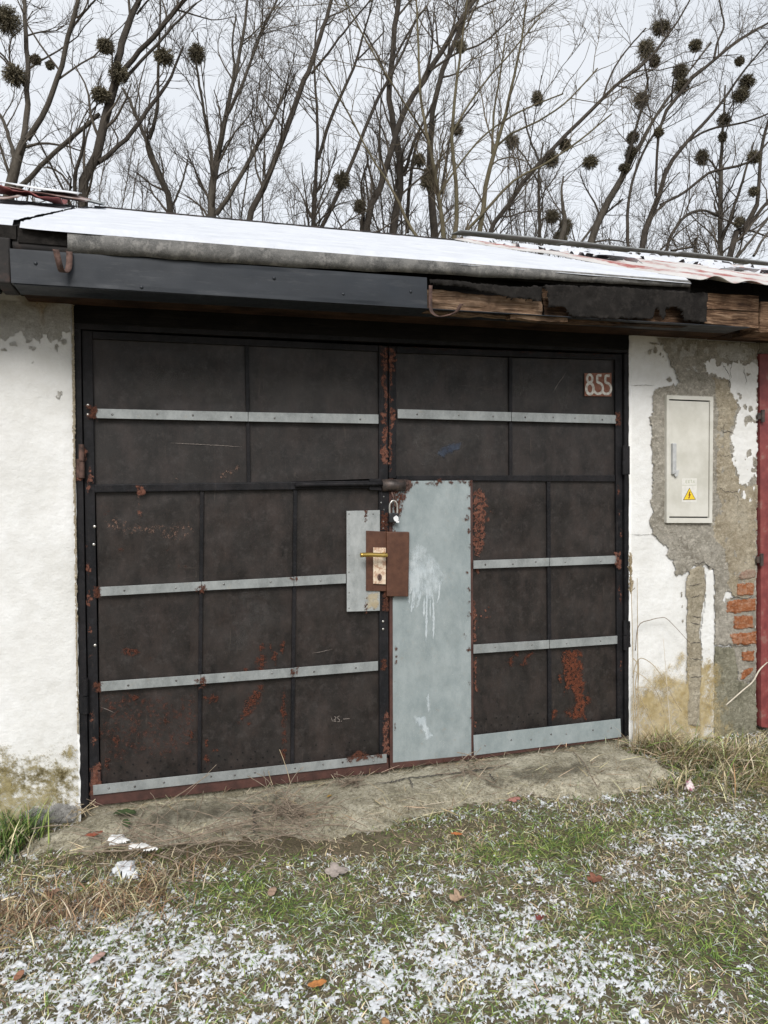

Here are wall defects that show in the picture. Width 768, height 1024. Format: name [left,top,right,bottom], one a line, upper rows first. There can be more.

corrosion [380,346,398,469]
peeling [0,301,79,734]
corrosion [380,479,493,574]
spalling [649,338,758,737]
corrosion [347,712,395,763]
corrosion [552,650,591,719]
water stain [631,654,728,747]
water stain [0,745,79,831]